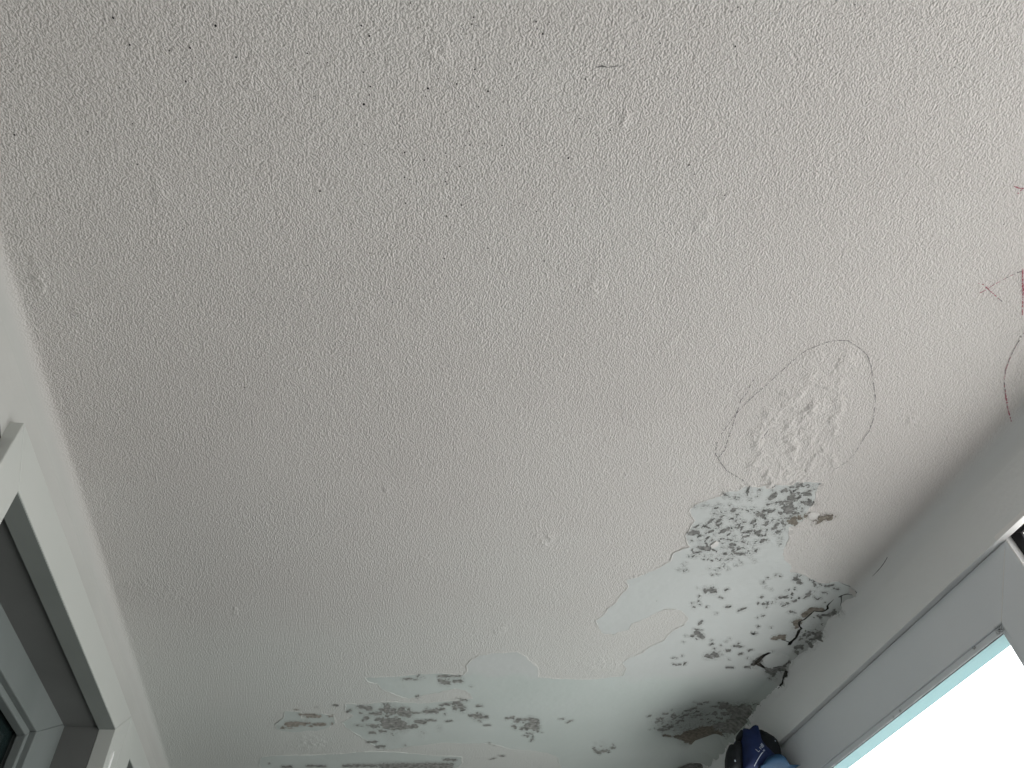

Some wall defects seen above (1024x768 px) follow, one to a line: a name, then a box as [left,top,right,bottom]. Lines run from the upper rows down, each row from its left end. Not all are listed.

peeling [258,479,859,768]
crack [746,582,857,688]